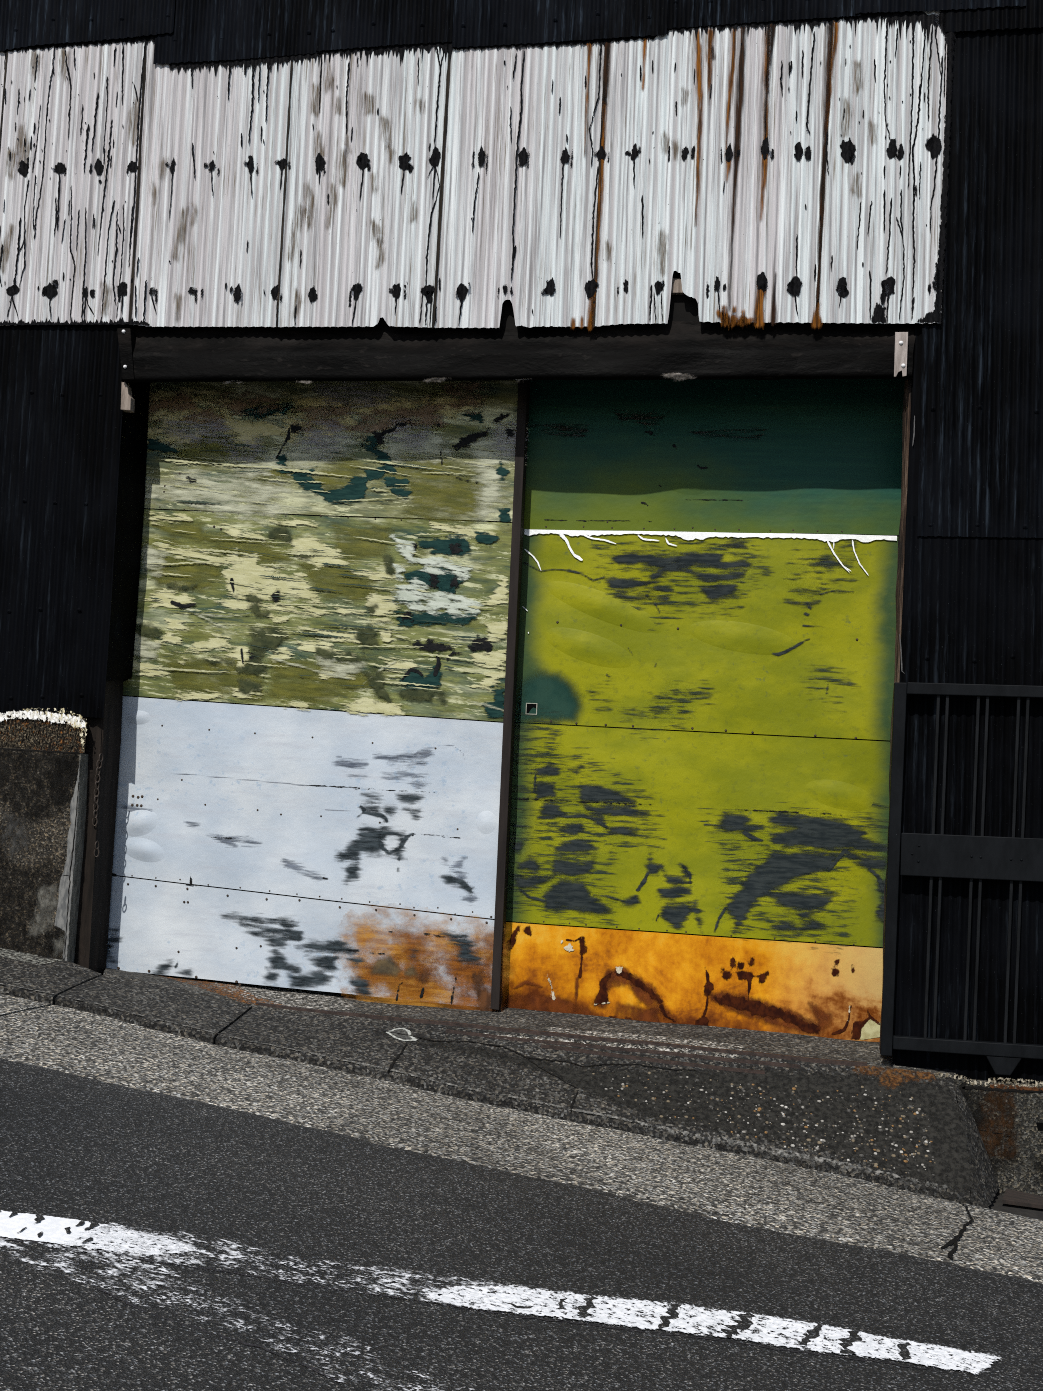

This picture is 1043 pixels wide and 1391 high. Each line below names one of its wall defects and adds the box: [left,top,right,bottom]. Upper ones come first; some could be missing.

leakage [0,51,31,176]
leakage [128,43,166,322]
leakage [276,62,348,328]
leakage [432,53,450,328]
corrosion [695,24,776,328]
corrosion [812,22,838,328]
peeling [132,378,517,718]
peeling [222,915,424,1001]
peeling [335,750,431,881]
corrosion [345,924,676,1023]
peeling [507,754,889,953]
corrosion [695,957,832,1034]